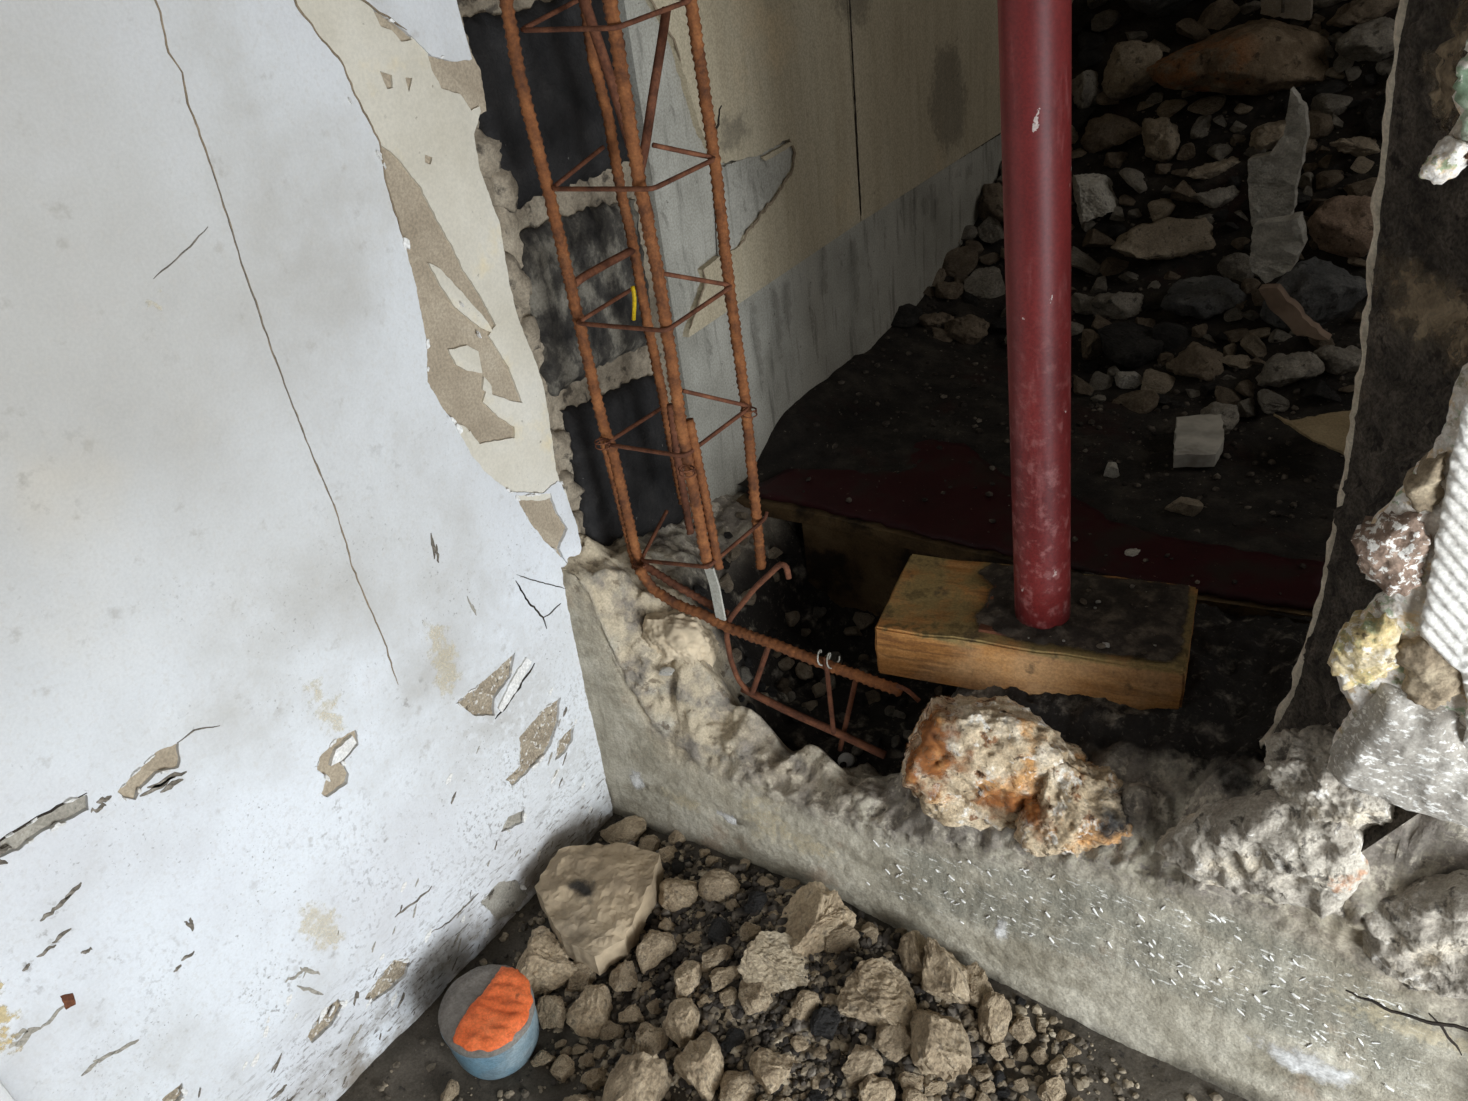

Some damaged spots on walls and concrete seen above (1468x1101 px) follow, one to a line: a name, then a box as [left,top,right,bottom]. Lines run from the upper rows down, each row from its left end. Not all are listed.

peeling [1452,39,1468,159]
crack [154,0,399,685]
peeling [294,0,569,557]
spalling [499,0,957,787]
spalling [0,725,220,865]
spalling [317,731,357,796]
rust [904,703,972,797]
rust [975,786,1046,825]
spalling [1153,724,1404,919]
spalling [308,878,419,1047]
spalling [452,877,528,971]
crack [1345,990,1468,1056]